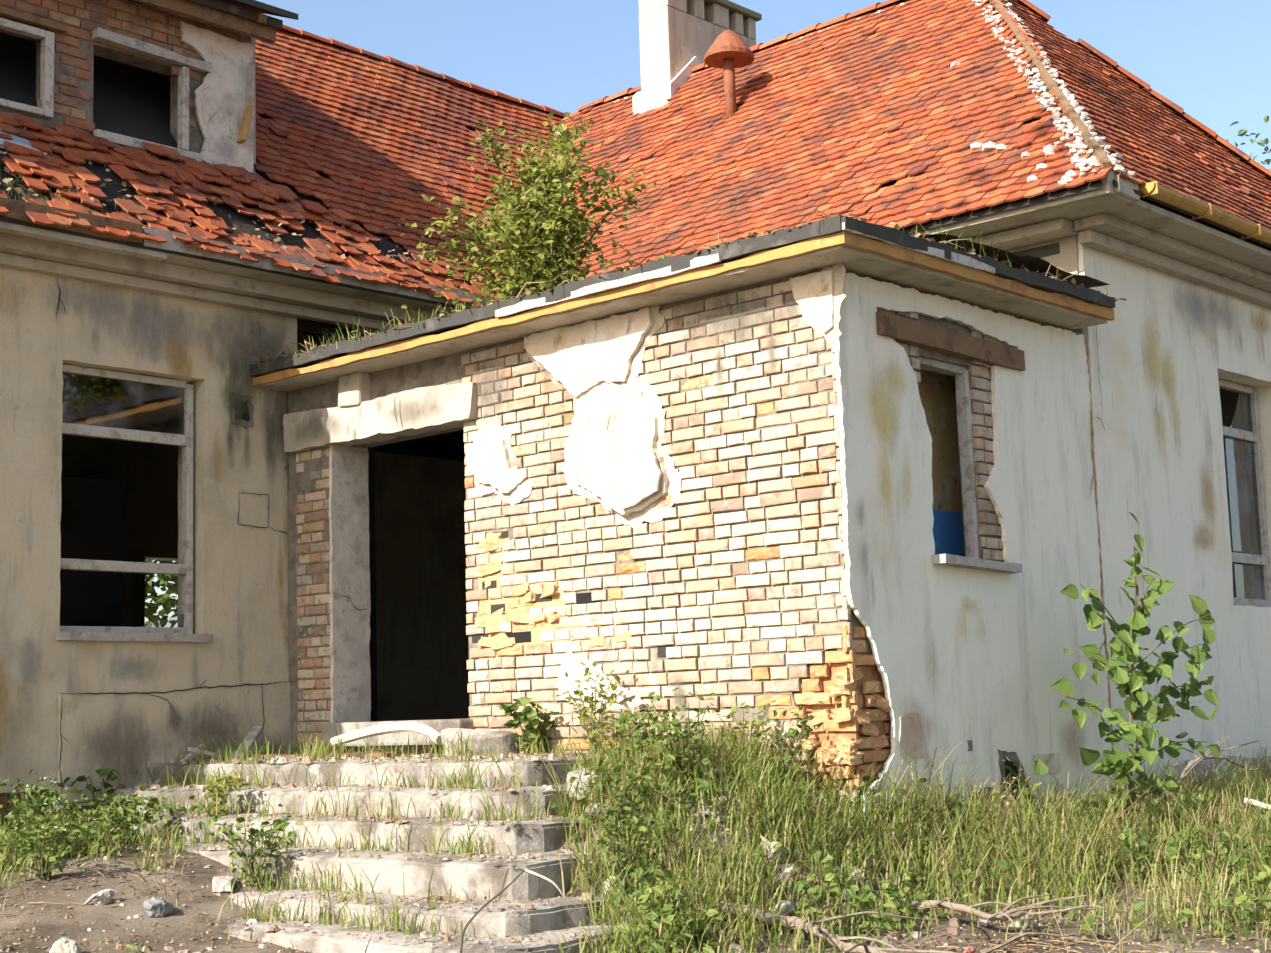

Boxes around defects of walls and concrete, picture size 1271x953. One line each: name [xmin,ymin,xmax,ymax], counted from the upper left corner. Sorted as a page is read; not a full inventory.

peeling [789,263,847,343]
peeling [524,305,665,400]
peeling [466,415,539,507]
spalling [472,528,652,714]
spalling [657,645,673,657]
crack [59,680,287,800]
spalling [794,649,932,790]